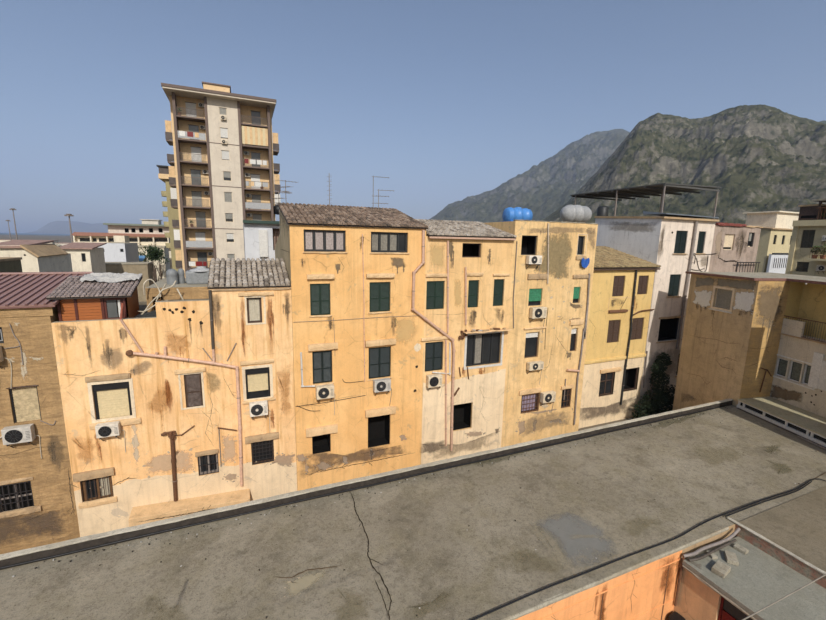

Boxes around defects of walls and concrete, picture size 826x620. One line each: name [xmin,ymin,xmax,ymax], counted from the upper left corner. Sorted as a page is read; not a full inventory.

damp [534,232,572,280]
peeling [693,289,712,307]
peeling [269,453,348,474]
crack [349,492,392,620]
spalling [279,565,345,597]